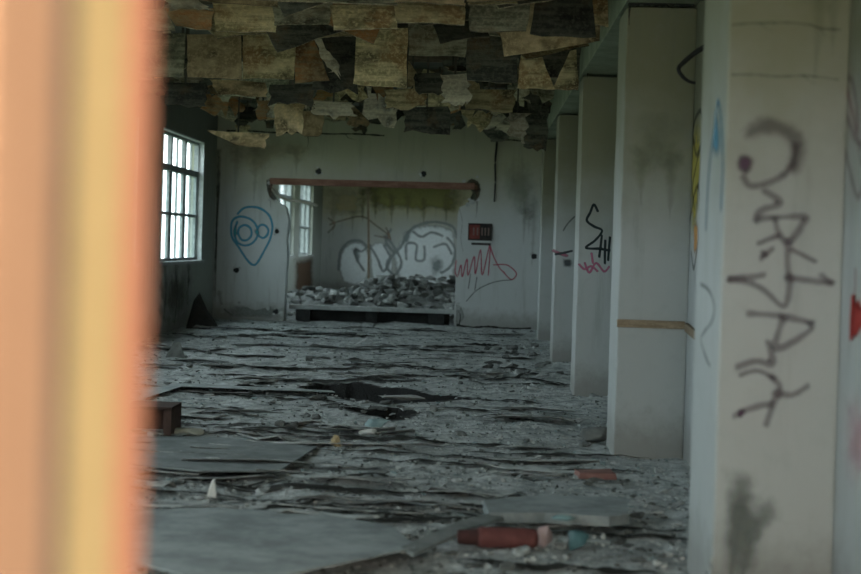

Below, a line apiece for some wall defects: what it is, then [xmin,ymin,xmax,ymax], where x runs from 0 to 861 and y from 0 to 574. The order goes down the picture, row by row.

water stain [363,187,457,210]
water stain [729,503,758,567]